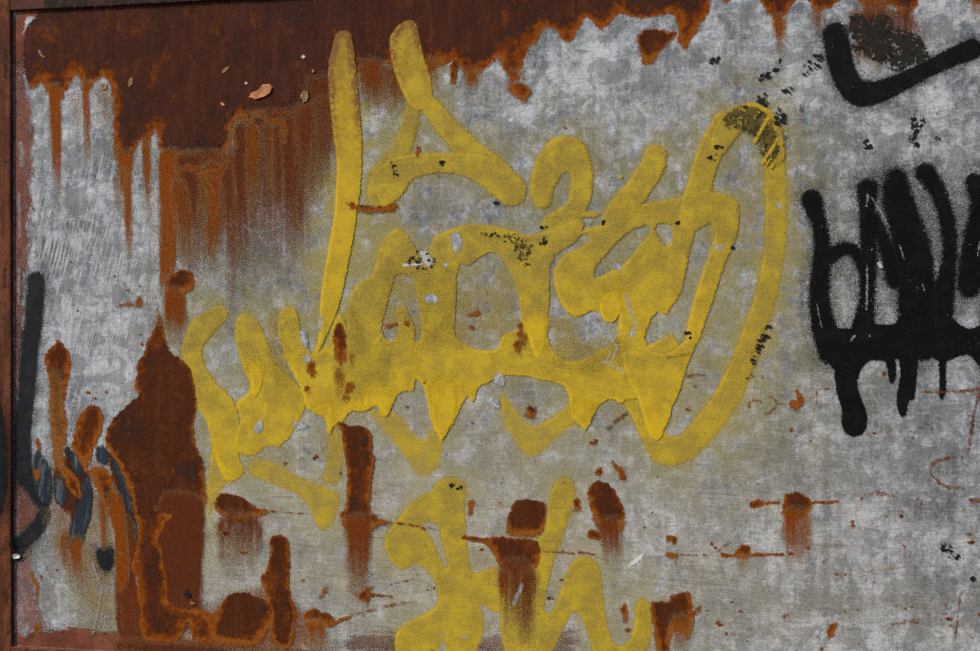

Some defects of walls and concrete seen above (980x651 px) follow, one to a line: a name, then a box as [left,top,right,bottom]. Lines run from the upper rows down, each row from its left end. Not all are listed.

corrosion [759,0,795,54]
corrosion [807,0,840,35]
corrosion [842,0,928,74]
corrosion [22,0,714,651]
corrosion [710,492,839,583]